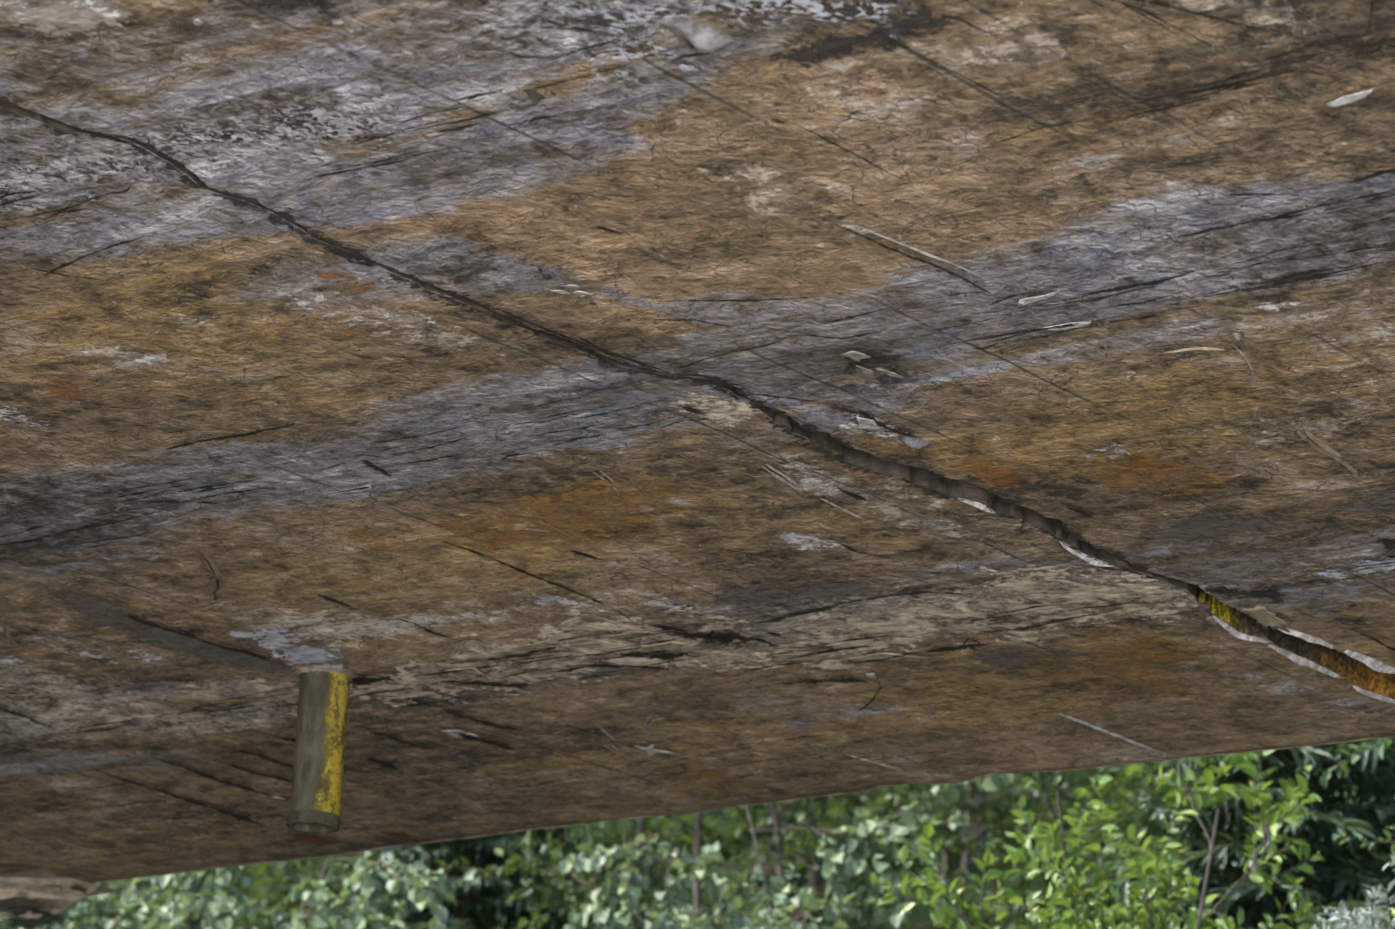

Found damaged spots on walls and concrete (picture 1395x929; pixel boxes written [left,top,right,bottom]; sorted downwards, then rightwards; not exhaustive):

damp [0,0,148,46]
crack [940,14,1004,40]
crack [1116,0,1395,56]
crack [883,35,1011,101]
crack [0,96,1395,704]
crack [0,707,58,730]
crack [357,698,518,770]
crack [859,675,882,711]